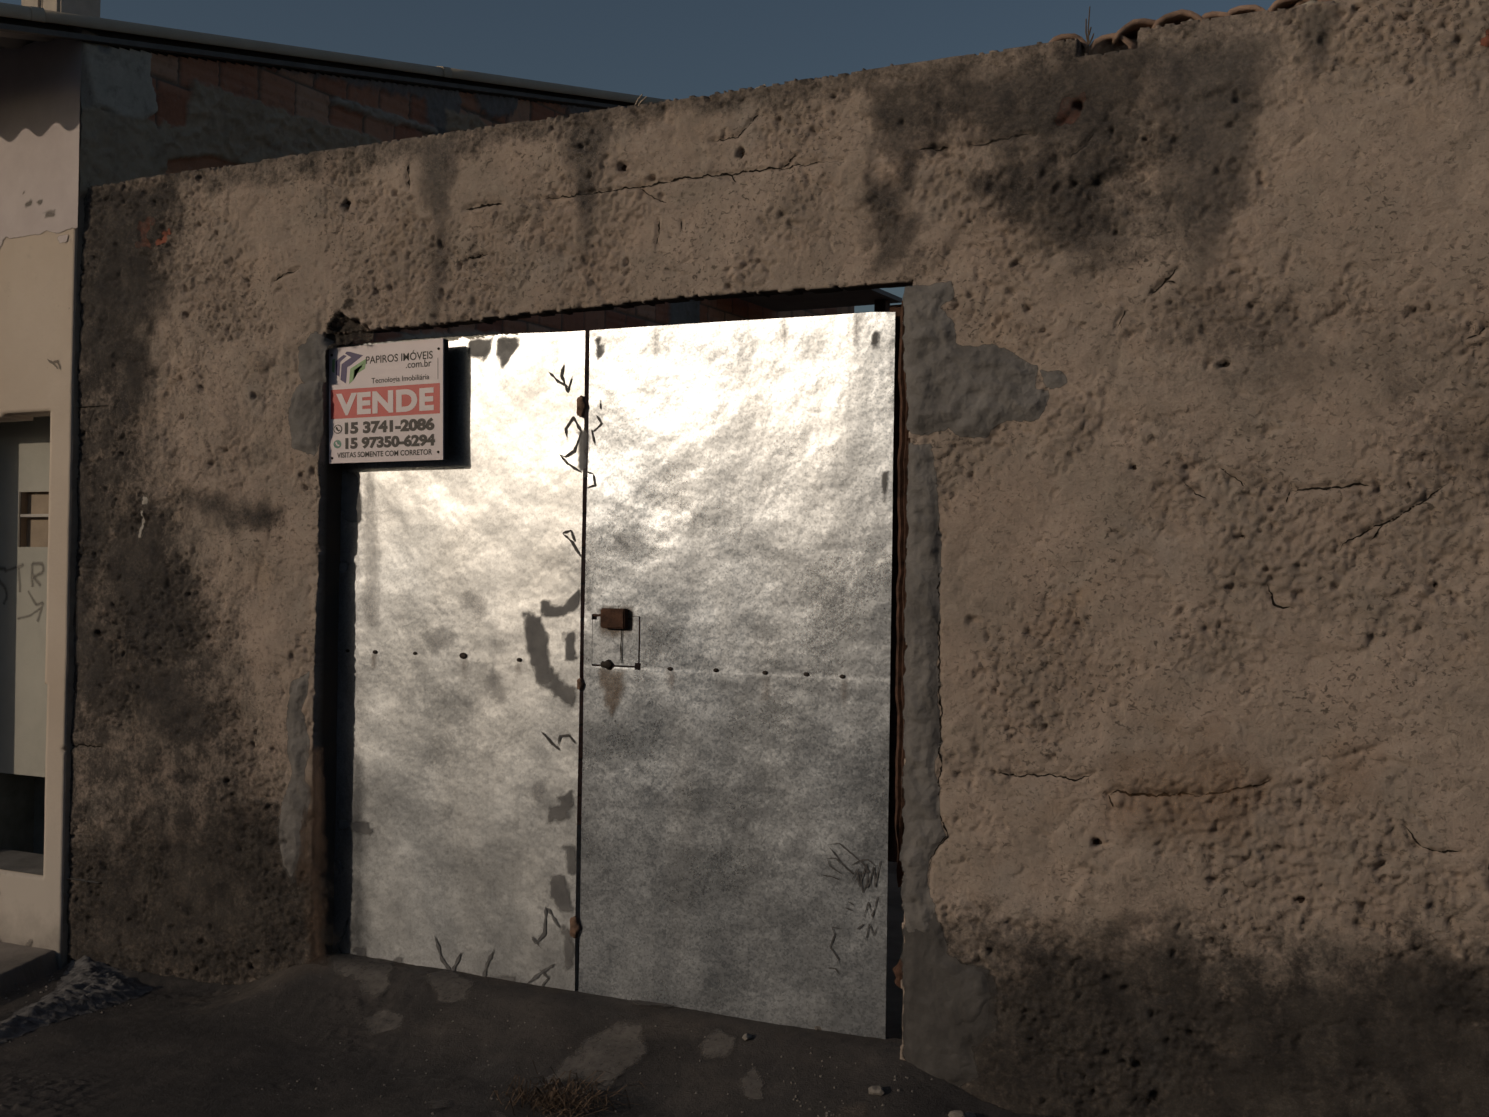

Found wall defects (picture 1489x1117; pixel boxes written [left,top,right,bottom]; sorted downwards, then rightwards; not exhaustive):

peeling [0,27,82,247]
crack [466,202,501,210]
crack [547,115,844,244]
damp [865,54,1140,265]
crack [1286,483,1369,502]
crack [1336,485,1445,552]
crack [991,770,1271,806]
damp [67,810,319,981]
damp [978,918,1489,1117]